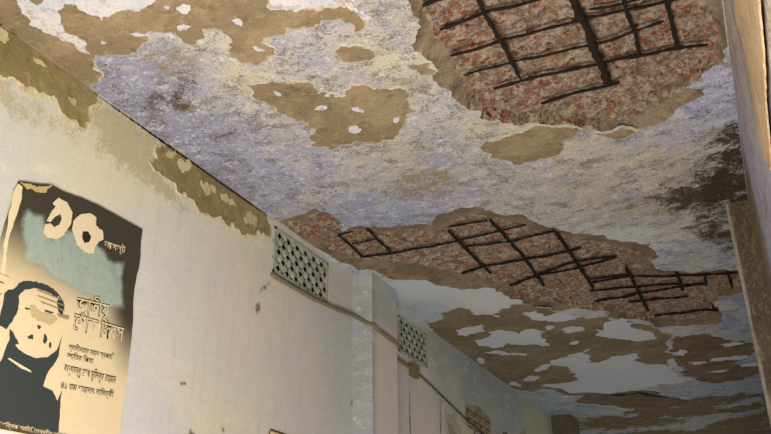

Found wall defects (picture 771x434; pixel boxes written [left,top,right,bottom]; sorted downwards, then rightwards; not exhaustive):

peeling [0,0,368,132]
peeling [246,77,419,150]
peeling [332,43,379,63]
spalling [406,0,771,175]
leakage [652,120,748,252]
spalling [149,142,770,434]